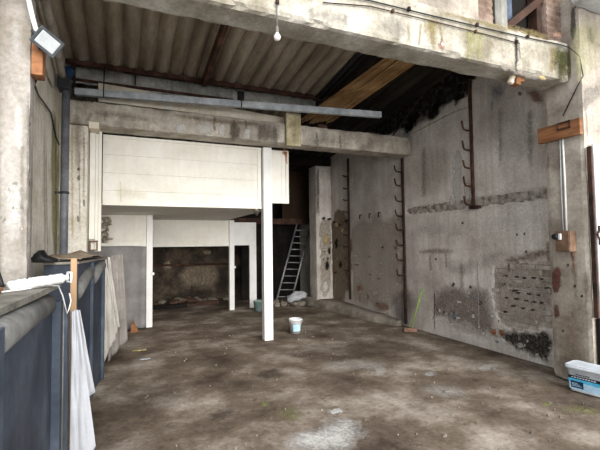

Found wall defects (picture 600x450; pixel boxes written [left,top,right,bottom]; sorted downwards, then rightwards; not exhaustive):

spalling [407,188,547,214]
peeling [319,209,352,300]
spalling [433,251,561,343]
damp [501,330,552,361]